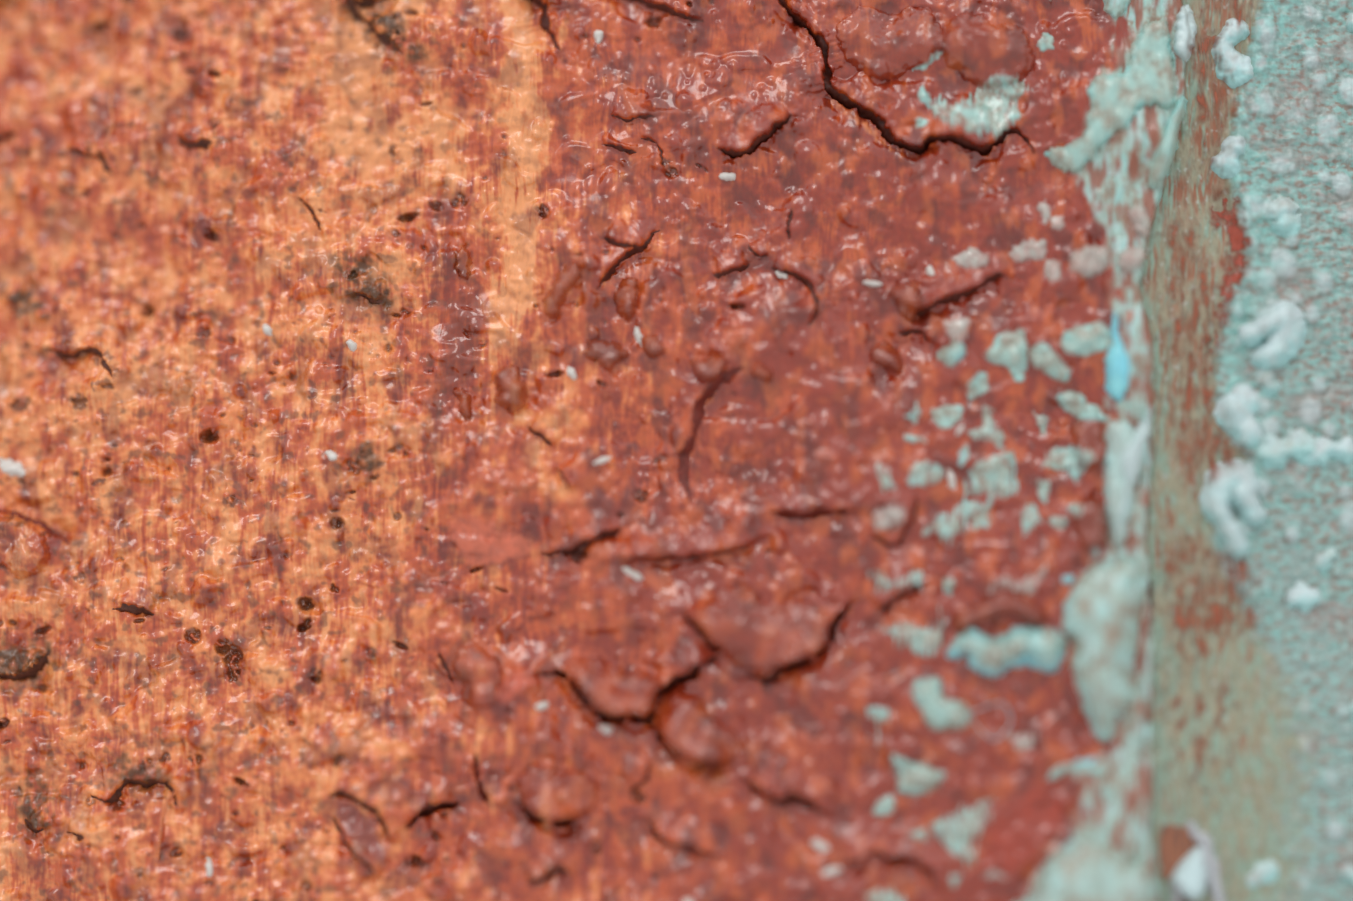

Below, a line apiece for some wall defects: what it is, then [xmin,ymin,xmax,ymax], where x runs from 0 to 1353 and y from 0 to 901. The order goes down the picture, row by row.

crack [779,0,1034,156]
peeling [1148,96,1188,189]
peeling [1173,4,1197,63]
rust [1193,36,1235,146]
rust [1201,0,1242,24]
crack [599,230,660,288]
rust [1170,191,1251,480]
crack [677,366,743,504]
crack [540,495,918,562]
crack [329,754,489,880]
spalling [972,780,1068,891]
peeling [1159,821,1225,901]